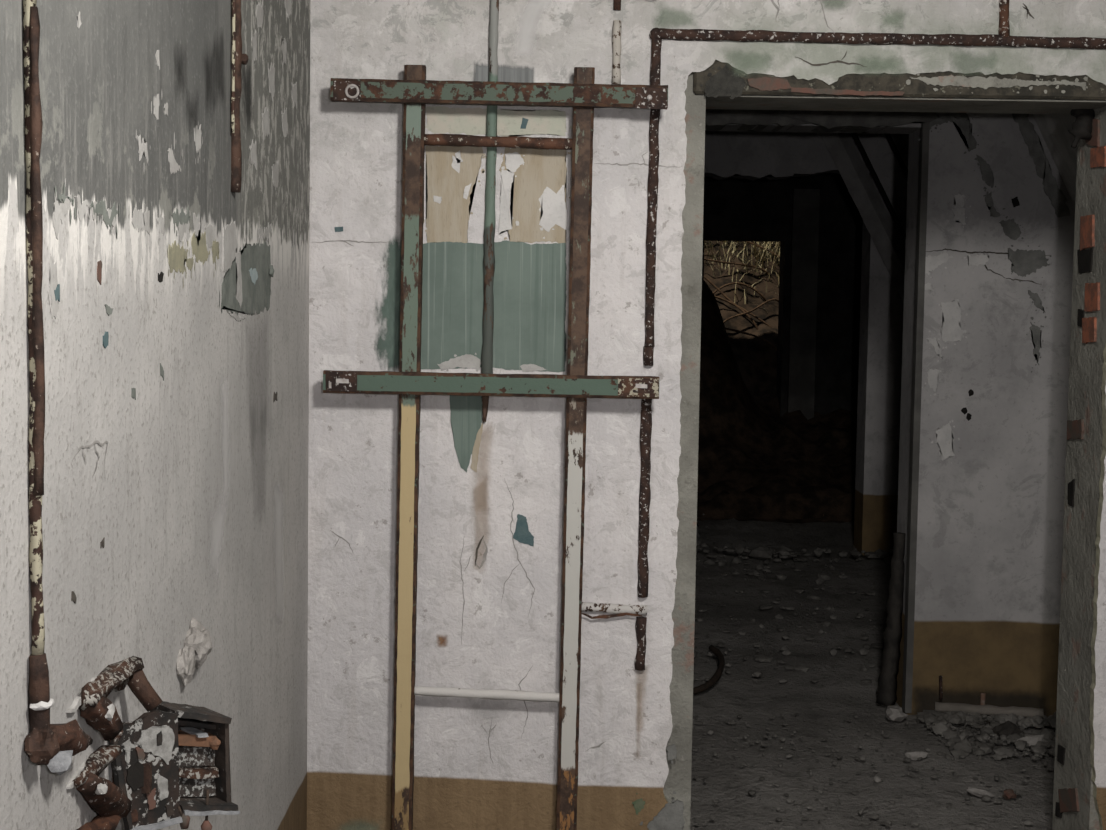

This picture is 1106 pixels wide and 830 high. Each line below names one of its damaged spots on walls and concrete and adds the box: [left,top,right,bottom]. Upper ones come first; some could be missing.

leakage [243,71,251,120]
peeling [700,64,1090,99]
flaking render [1085,119,1106,168]
peeling [424,104,573,244]
peeling [53,178,120,240]
peeling [132,199,274,321]
peeling [49,253,60,319]
peeling [437,353,481,371]
peeling [520,364,546,372]
flaking render [1067,419,1084,440]
peeling [513,514,534,546]
spalling [666,744,680,764]